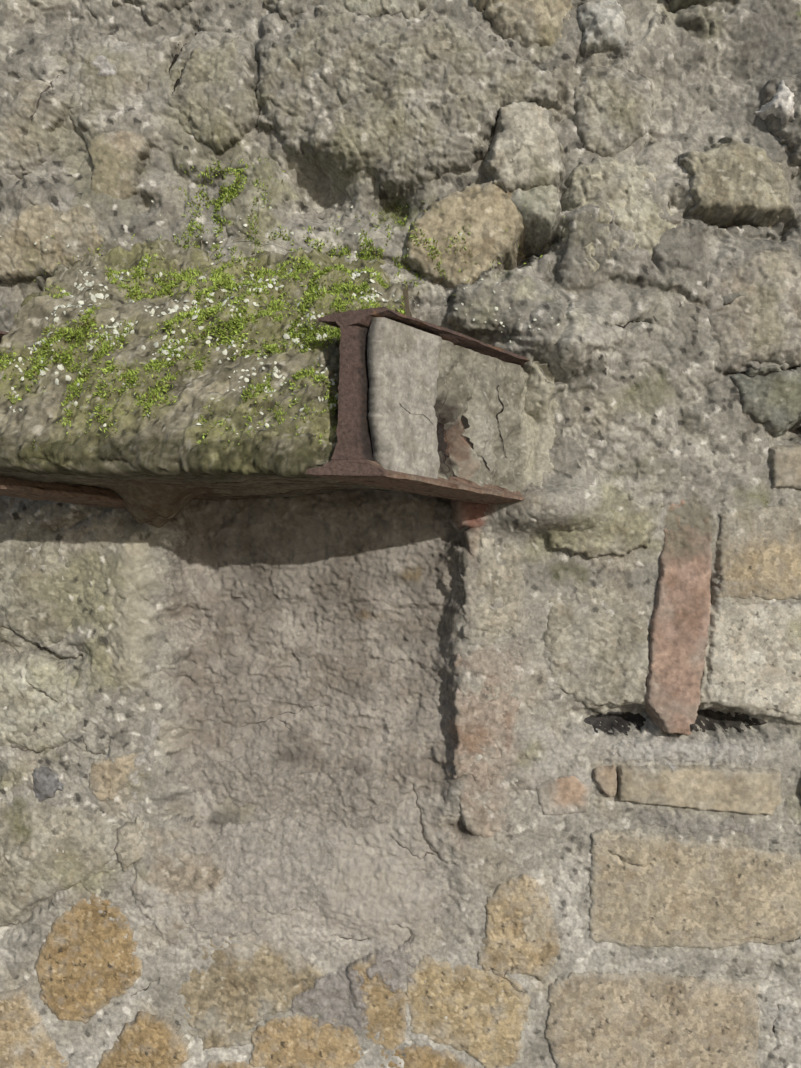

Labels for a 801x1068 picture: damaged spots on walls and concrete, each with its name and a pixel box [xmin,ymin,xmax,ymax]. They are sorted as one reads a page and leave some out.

crack [460,385,507,470]
crack [389,792,454,864]